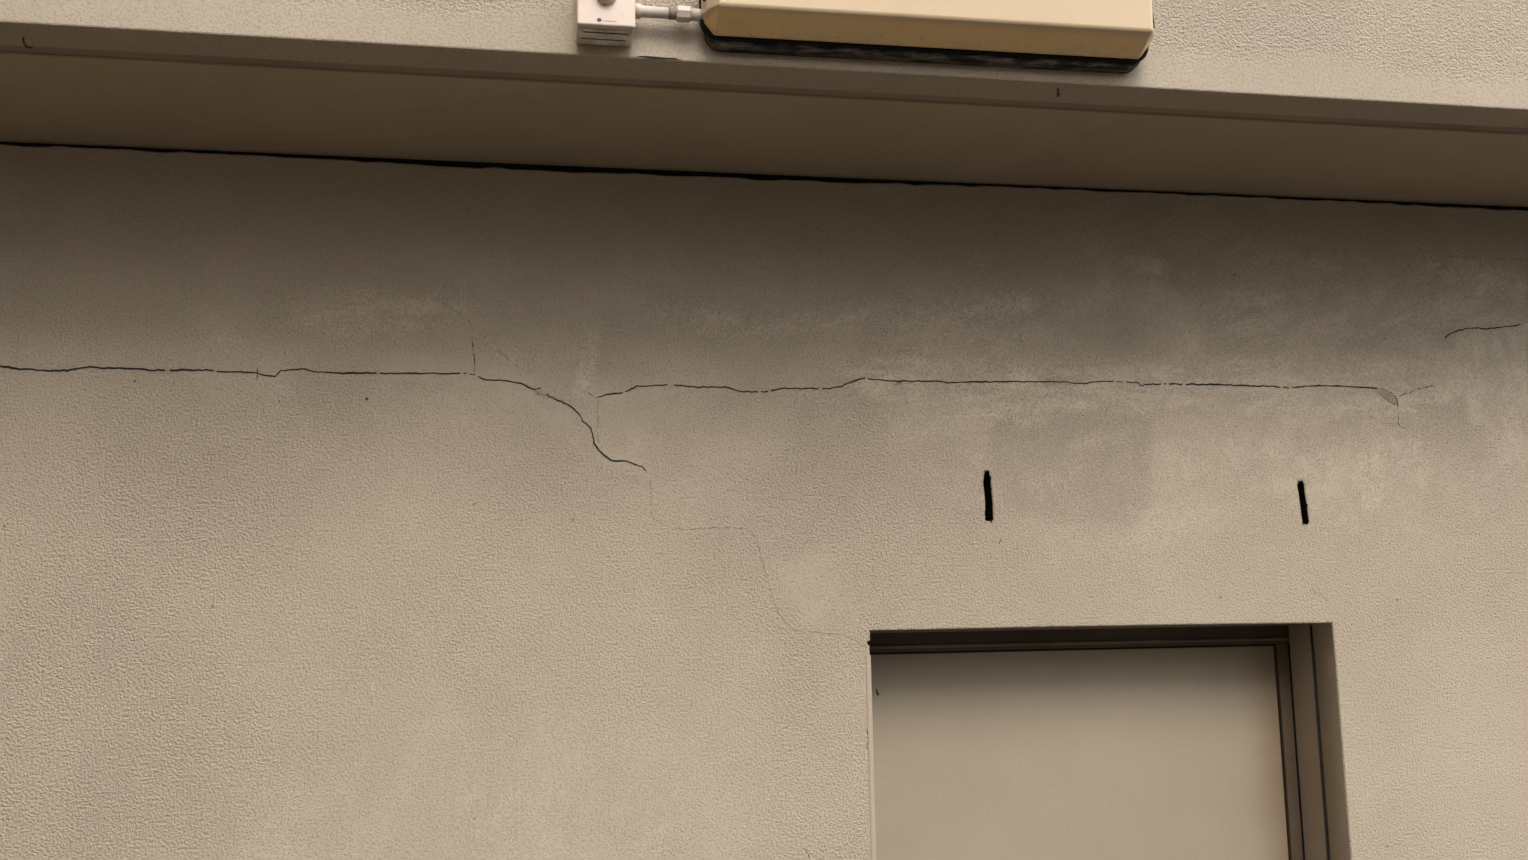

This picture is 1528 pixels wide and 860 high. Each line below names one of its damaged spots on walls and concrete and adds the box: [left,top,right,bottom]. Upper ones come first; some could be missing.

crack [0,343,1435,471]